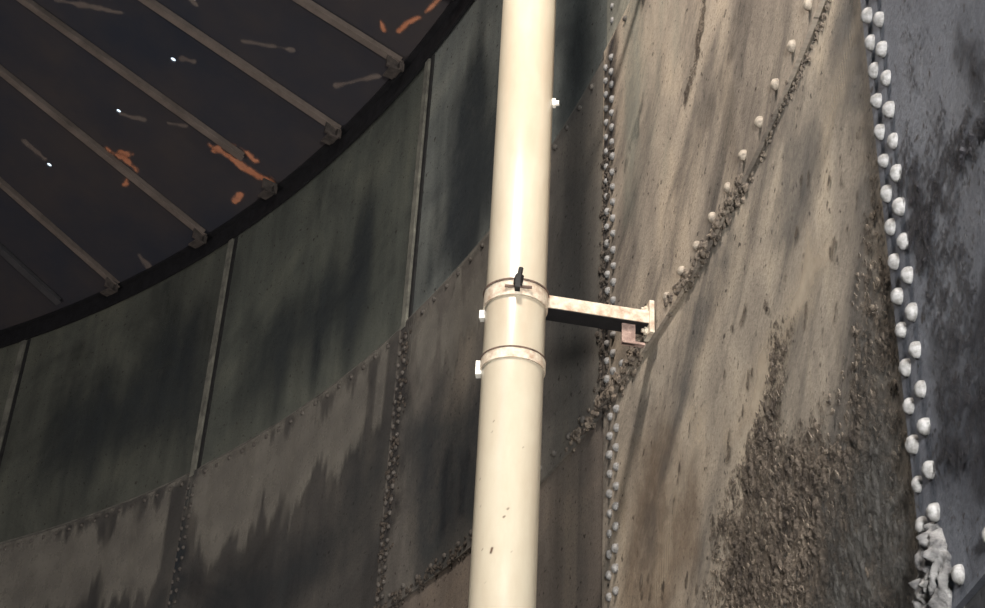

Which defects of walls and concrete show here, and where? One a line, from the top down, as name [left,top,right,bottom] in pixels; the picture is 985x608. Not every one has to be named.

corrosion [380,0,439,33]
corrosion [106,148,137,171]
corrosion [210,145,274,182]
damp [0,230,490,608]